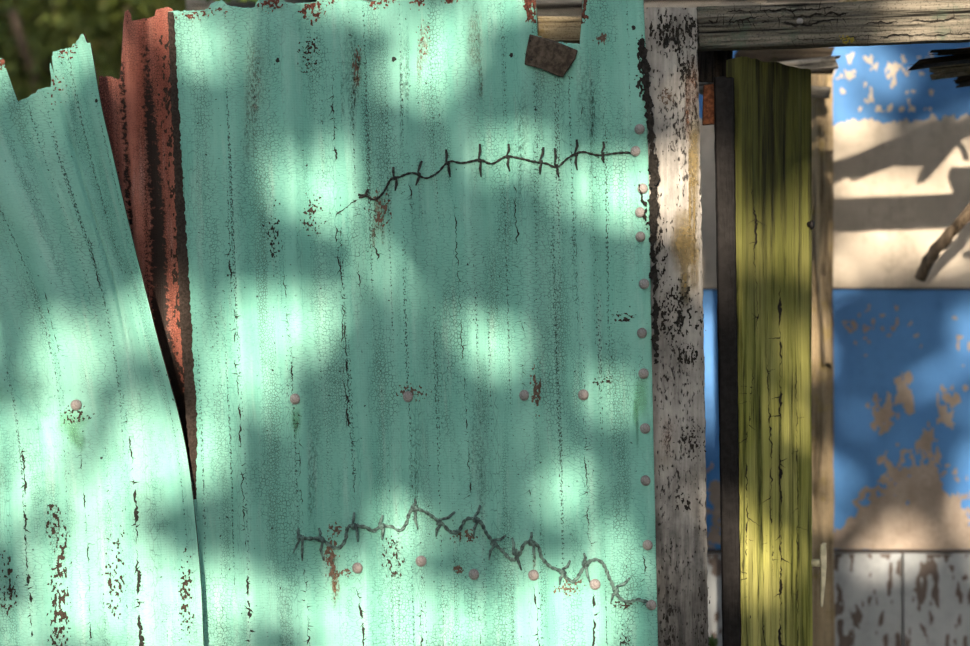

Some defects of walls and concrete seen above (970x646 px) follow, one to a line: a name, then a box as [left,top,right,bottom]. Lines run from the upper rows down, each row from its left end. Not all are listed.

peeling [655,118,717,369]
peeling [842,304,922,356]
peeling [866,371,915,436]
peeling [833,52,970,288]
peeling [834,385,970,646]